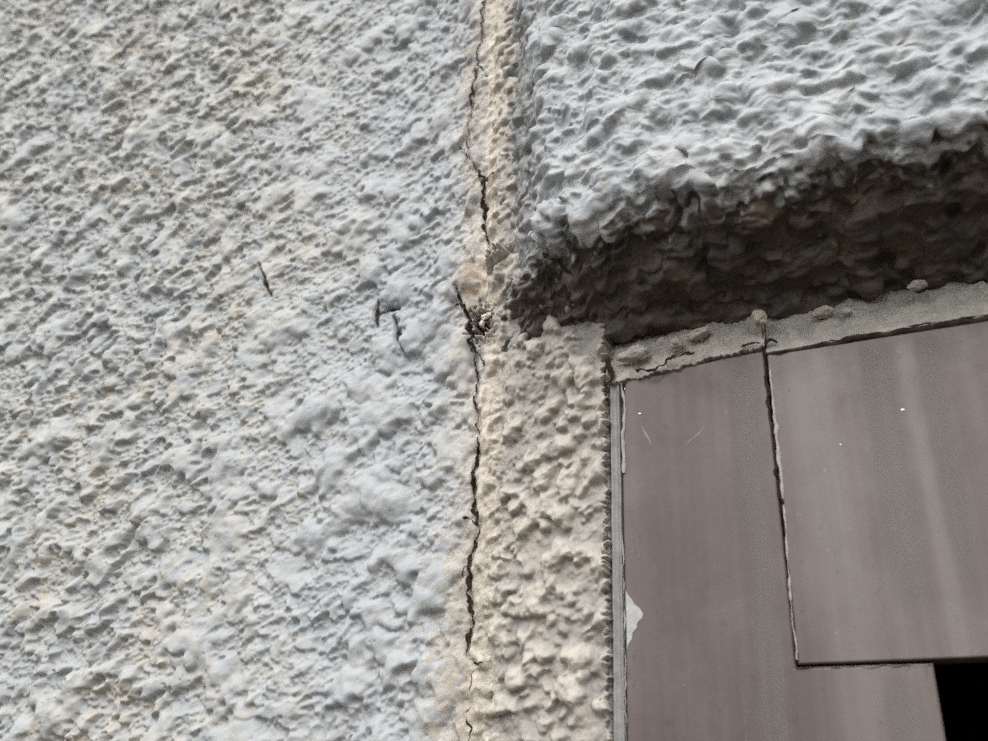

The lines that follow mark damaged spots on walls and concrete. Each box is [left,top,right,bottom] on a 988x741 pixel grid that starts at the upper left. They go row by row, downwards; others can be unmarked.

crack [459,0,494,245]
crack [454,287,485,740]